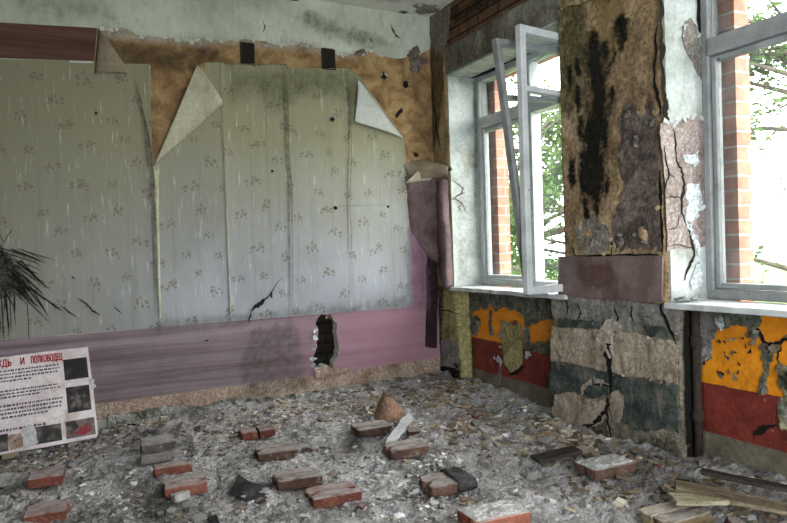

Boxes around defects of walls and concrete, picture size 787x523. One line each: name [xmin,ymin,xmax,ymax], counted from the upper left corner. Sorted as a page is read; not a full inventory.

peeling [94,26,322,165]
peeling [335,3,451,176]
damp [558,0,630,219]
crack [571,0,695,280]
flaking render [575,98,706,289]
peeling [682,18,702,80]
damp [0,230,76,338]
flaking render [95,256,460,429]
peeling [468,292,680,433]
crack [582,343,612,438]
peeling [700,303,787,430]
crack [756,328,787,364]